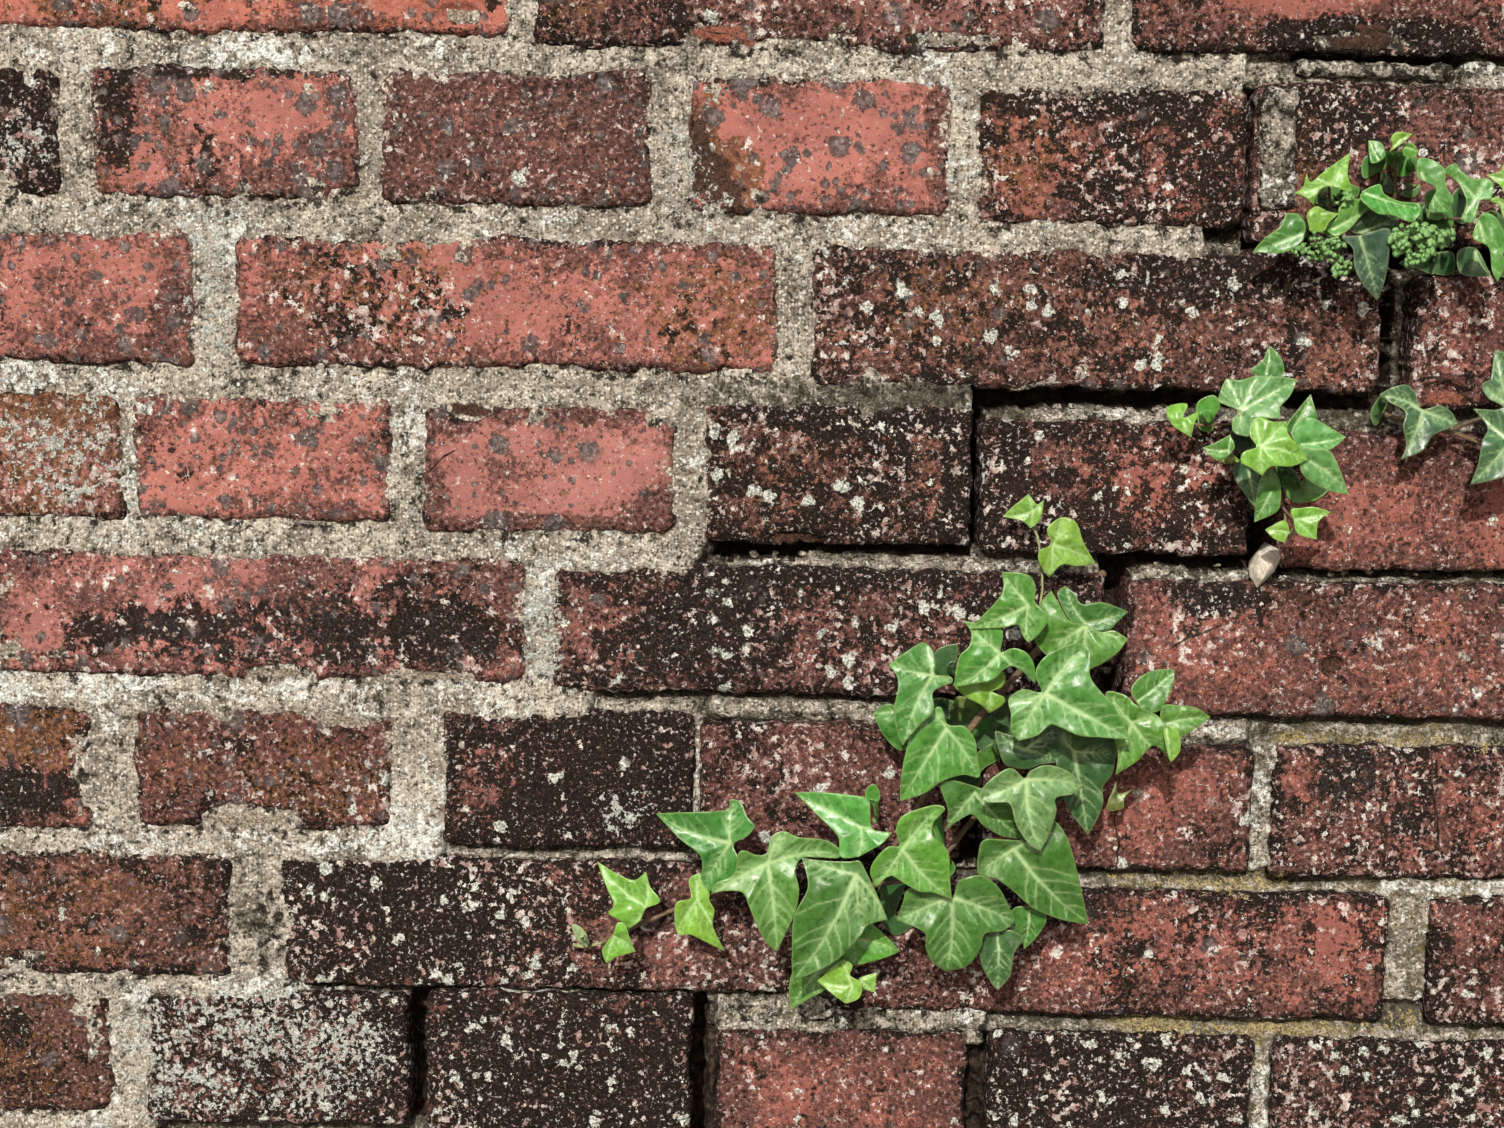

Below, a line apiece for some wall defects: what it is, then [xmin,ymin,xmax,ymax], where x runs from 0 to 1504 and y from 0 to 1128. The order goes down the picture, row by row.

crack [1291,52,1461,67]
crack [1240,243,1257,251]
crack [1282,247,1492,414]
crack [714,386,1234,563]
crack [1097,511,1504,696]
crack [955,814,978,866]
crack [1113,811,1121,868]
crack [1368,786,1388,874]
crack [1430,751,1440,845]
crack [692,991,719,1128]
crack [963,1031,987,1128]